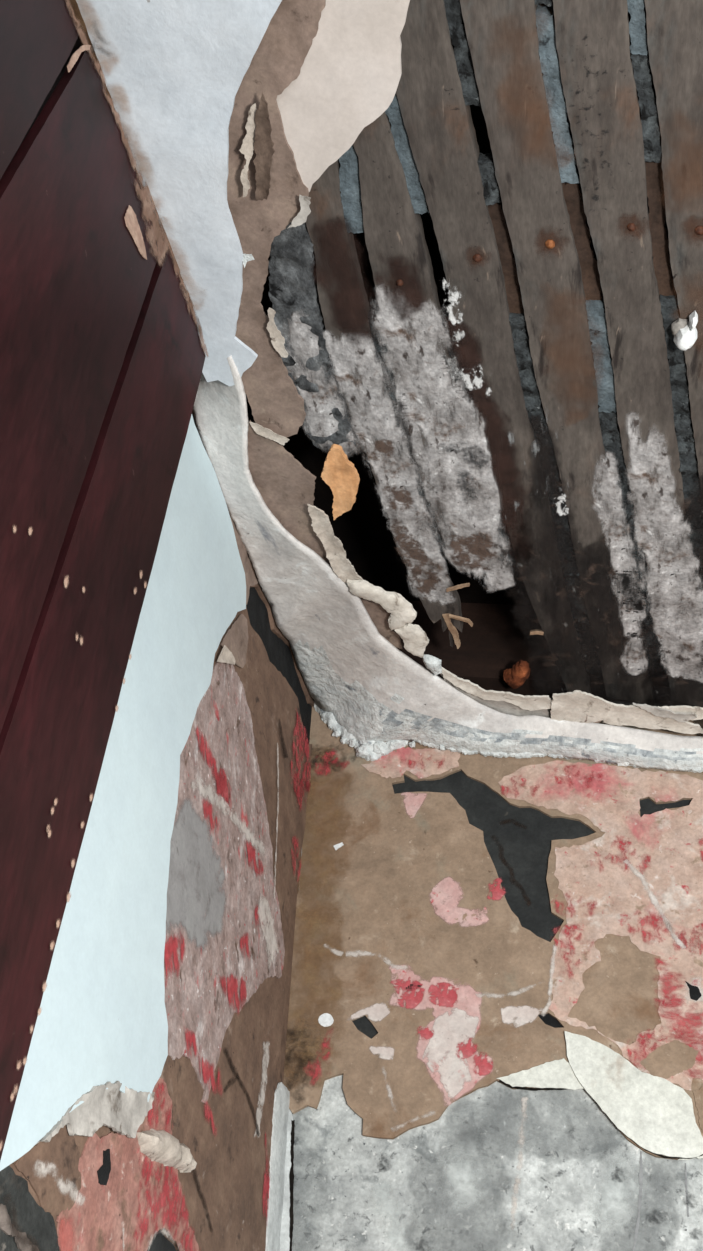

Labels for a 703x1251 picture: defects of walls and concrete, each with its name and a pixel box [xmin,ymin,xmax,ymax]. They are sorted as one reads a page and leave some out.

peeling [66,0,208,357]
peeling [227,0,703,734]
damp [285,218,703,707]
peeling [164,514,285,1133]
peeling [291,712,703,1160]
peeling [0,1078,199,1251]
peeling [263,1082,293,1251]